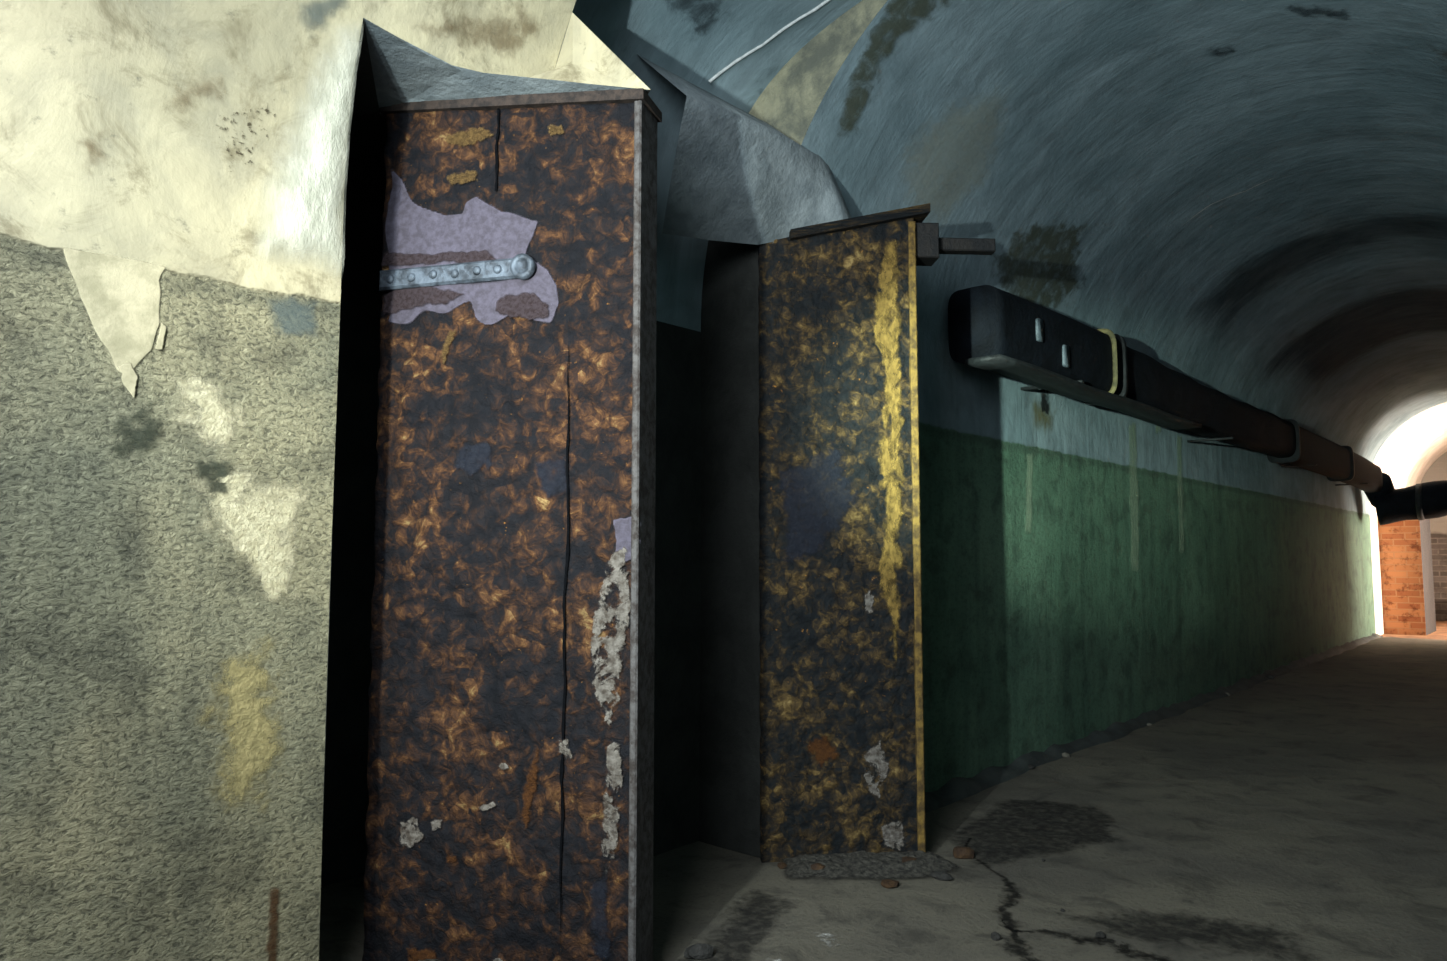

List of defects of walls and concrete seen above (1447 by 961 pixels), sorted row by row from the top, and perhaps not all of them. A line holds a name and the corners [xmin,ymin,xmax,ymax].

water stain [841,0,946,131]
rust [447,170,477,184]
rust [446,127,493,146]
rust [548,125,564,136]
peeling [63,247,166,398]
rust [442,331,456,363]
peeling [176,376,244,445]
peeling [206,471,307,600]
peeling [590,547,631,724]
rust [522,752,538,828]
peeling [601,742,623,858]
crack [965,838,1170,961]